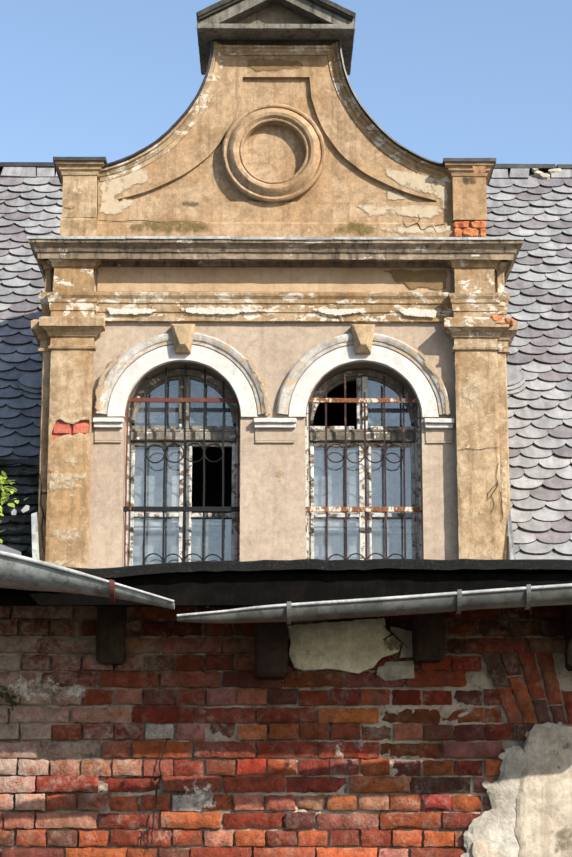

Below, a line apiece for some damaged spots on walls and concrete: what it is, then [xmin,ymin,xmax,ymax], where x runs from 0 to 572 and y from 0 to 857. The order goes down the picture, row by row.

flaking render [99,169,148,215]
flaking render [356,168,486,237]
peeling [107,307,156,315]
peeling [313,307,366,316]
peeling [397,307,437,318]
spalling [491,315,514,326]
spalling [53,416,90,434]
crack [486,466,503,524]
peeling [376,627,415,681]
leakage [6,676,85,702]